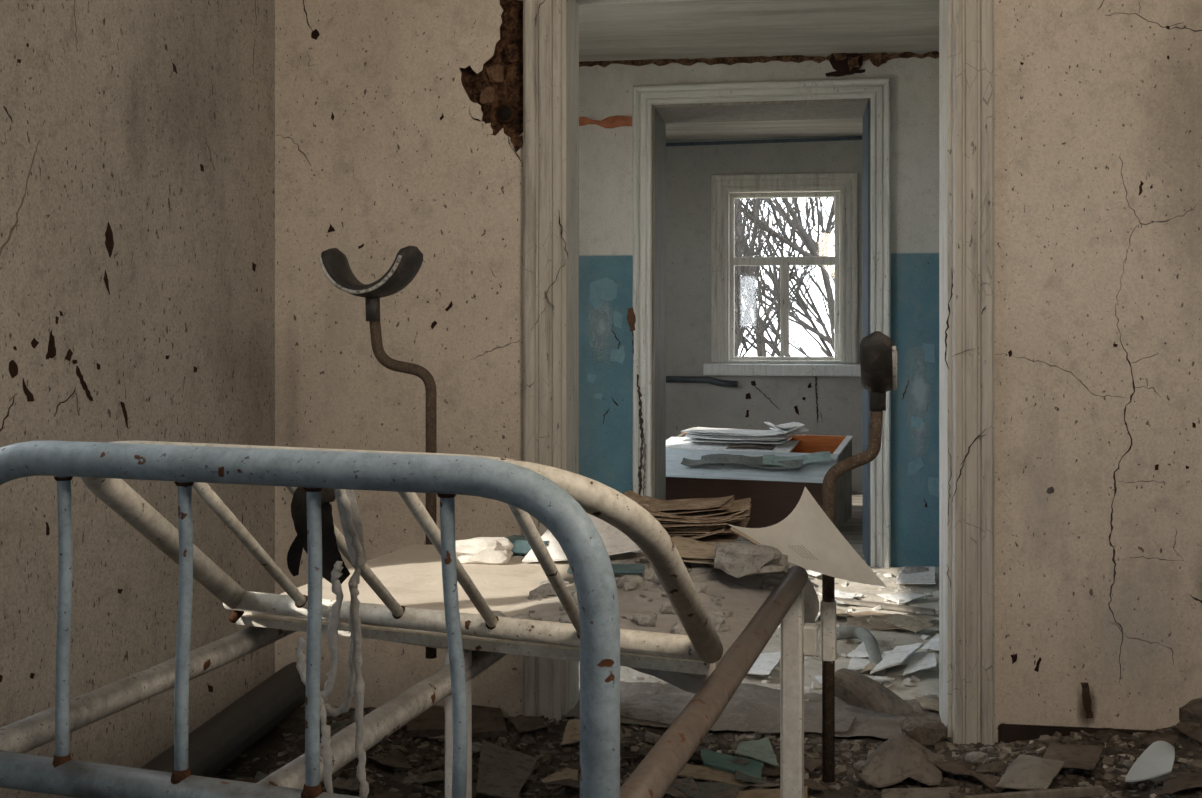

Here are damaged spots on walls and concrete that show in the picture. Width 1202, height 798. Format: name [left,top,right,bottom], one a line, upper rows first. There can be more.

crack [1098,0,1202,32]
spalling [825,52,888,77]
spalling [462,0,523,164]
spalling [579,116,632,128]
crack [945,157,1196,686]